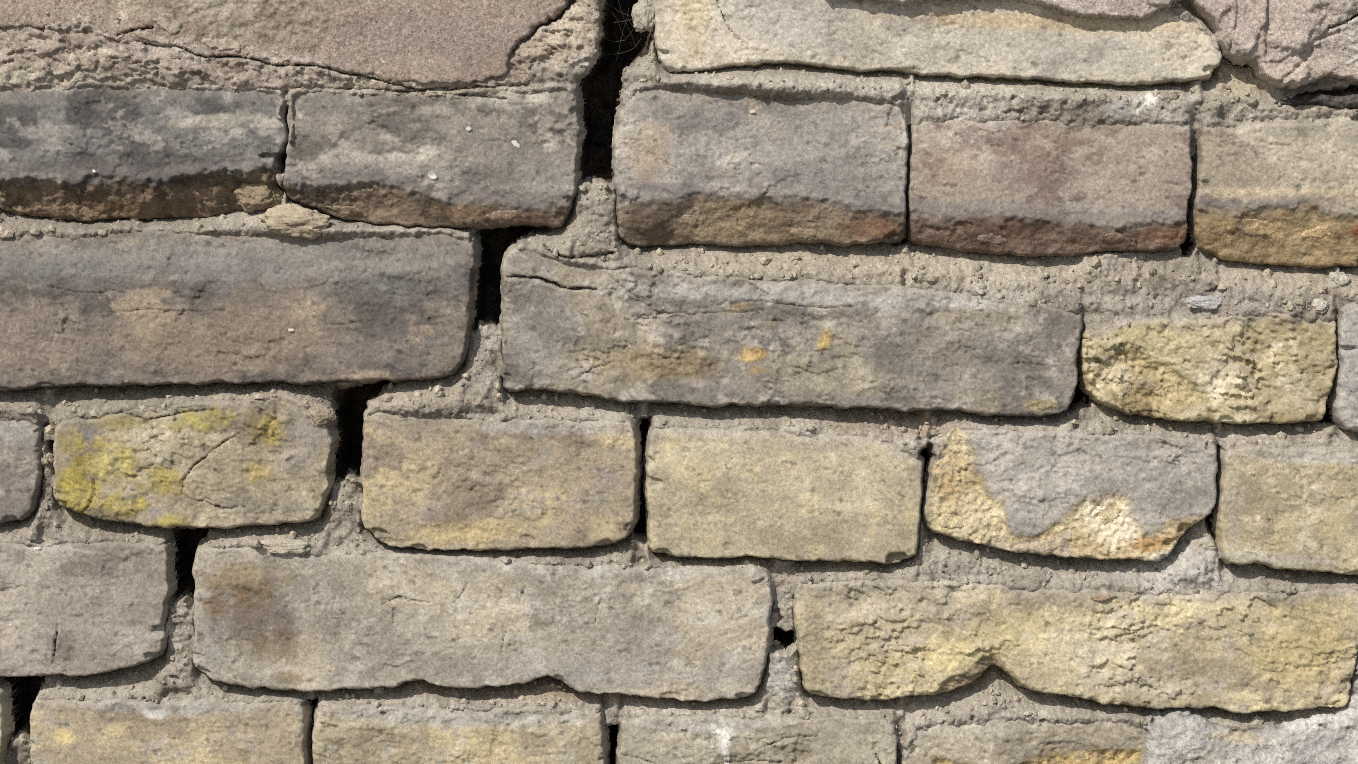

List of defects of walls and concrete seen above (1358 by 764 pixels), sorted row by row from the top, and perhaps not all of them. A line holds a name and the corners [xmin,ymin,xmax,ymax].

crack [180,47,380,80]
crack [581,0,653,182]
spalling [0,170,569,228]
crack [474,225,611,330]
spalling [617,195,1358,269]
spalling [1185,295,1222,310]
crack [333,380,396,478]
spalling [1099,350,1208,413]
spalling [927,427,1206,561]
crack [171,504,233,599]
crack [5,631,58,734]
spalling [935,657,1017,694]